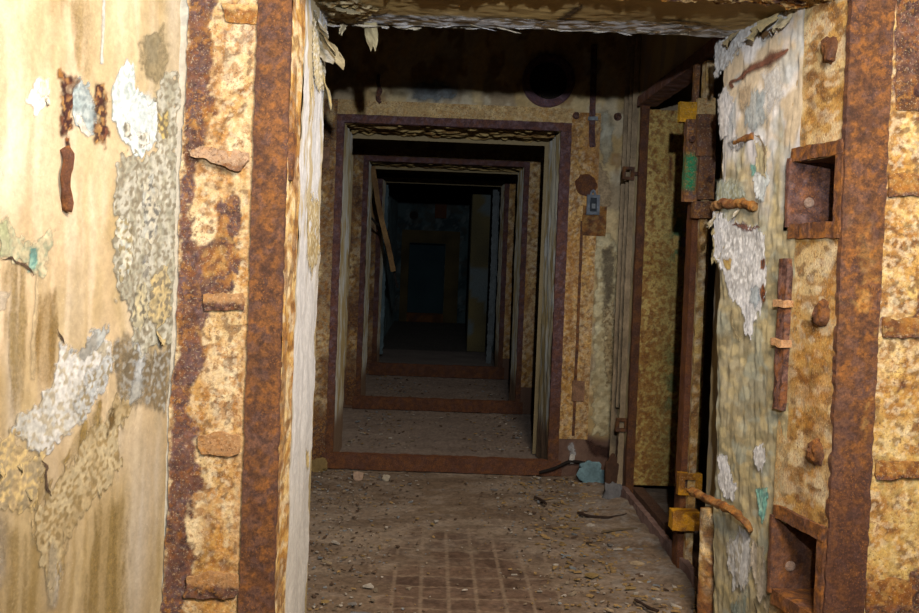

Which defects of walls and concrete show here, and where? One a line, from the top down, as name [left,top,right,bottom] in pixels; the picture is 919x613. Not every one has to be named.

spalling [72,77,97,137]
damp [141,24,168,83]
peeling [309,0,794,120]
peeling [0,216,53,278]
peeling [112,59,182,359]
spalling [306,192,320,280]
peeling [707,67,783,341]
damp [0,267,58,401]
peeling [0,325,132,606]
damp [64,400,102,463]
damp [85,509,124,613]